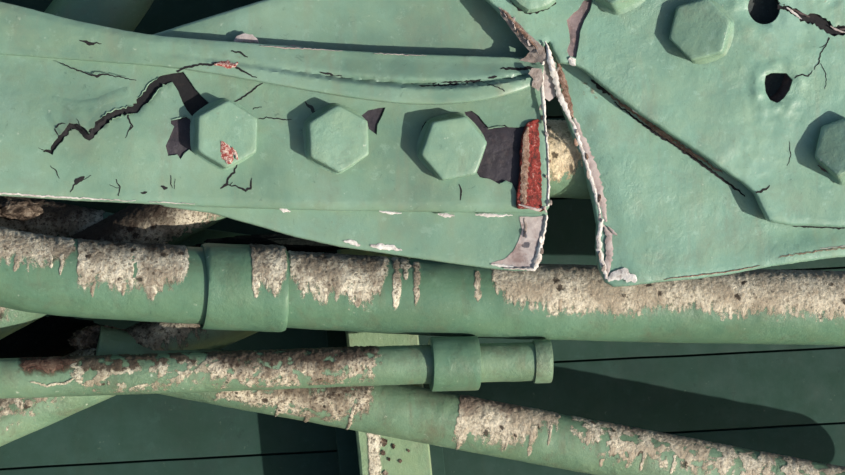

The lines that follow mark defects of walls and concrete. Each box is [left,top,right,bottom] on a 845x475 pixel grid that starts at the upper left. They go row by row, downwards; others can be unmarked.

crack [39,50,292,192]
peeling [465,111,525,192]
rust [516,119,546,212]
peeling [498,0,592,181]
crack [591,79,770,197]
crack [778,2,845,87]
peeling [0,192,219,301]
peeling [474,200,845,321]
rust [19,356,78,387]
peeling [452,395,561,456]
peeling [571,416,845,475]